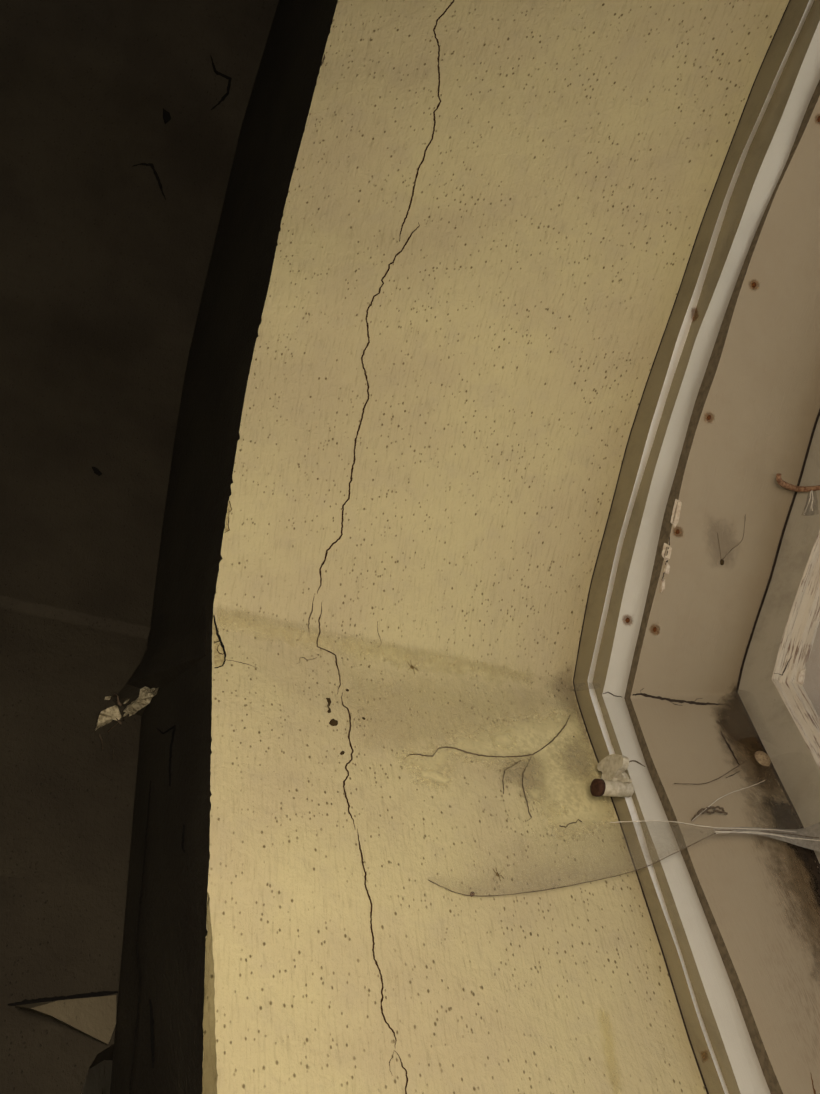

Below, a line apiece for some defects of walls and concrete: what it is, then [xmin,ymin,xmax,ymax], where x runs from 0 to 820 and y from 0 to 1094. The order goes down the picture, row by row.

crack [299,0,454,1094]
spalling [96,686,158,760]
crack [404,712,573,819]
peeling [404,713,613,832]